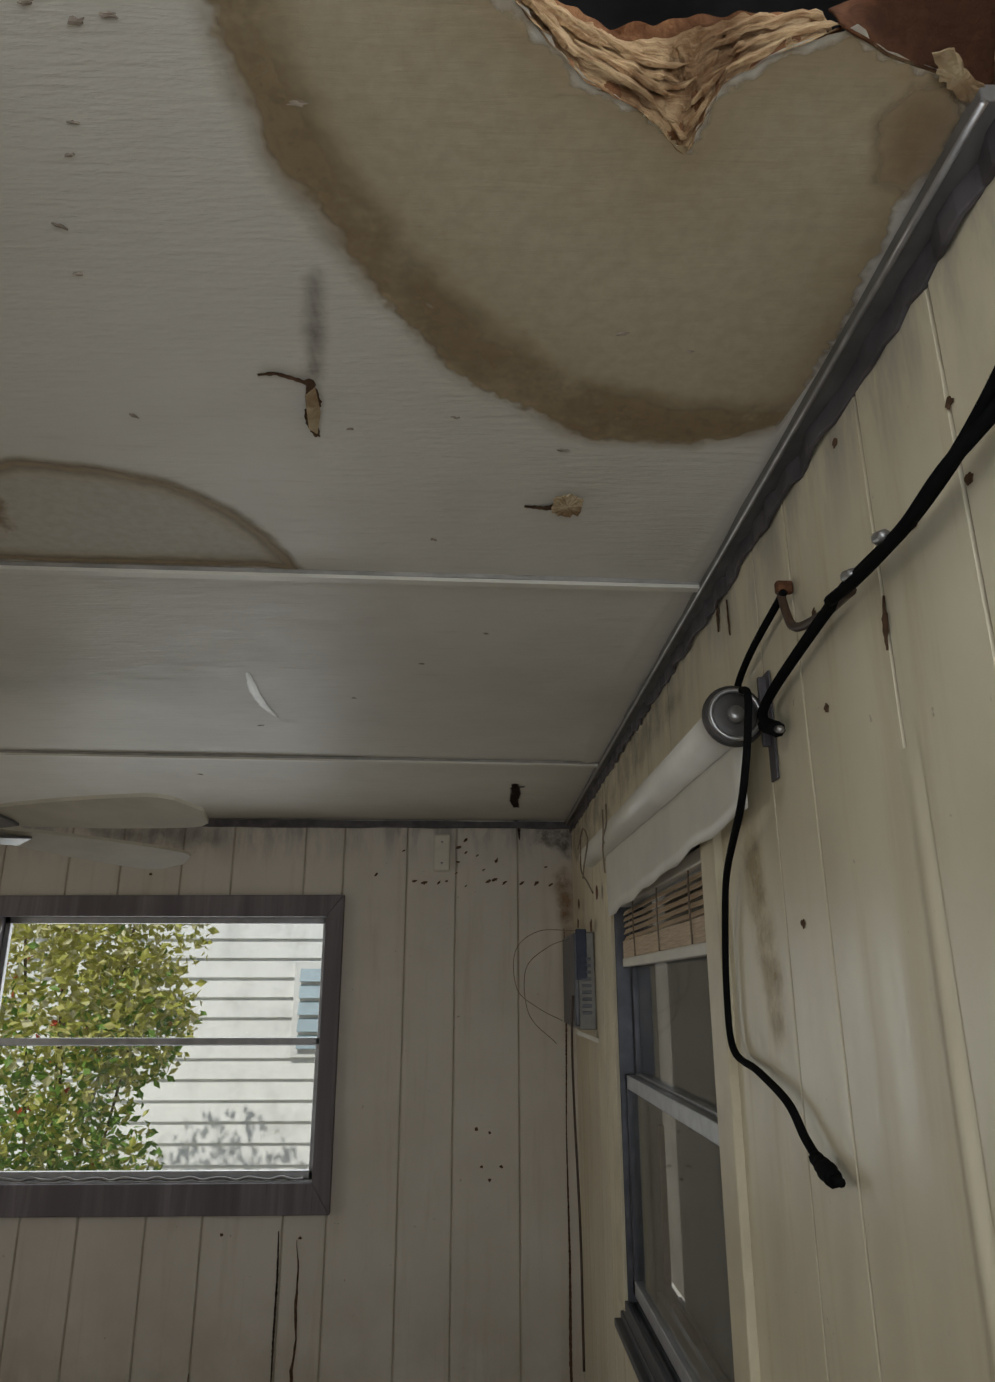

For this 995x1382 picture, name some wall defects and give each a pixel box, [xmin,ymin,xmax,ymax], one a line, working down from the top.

peeling [67,11,118,25]
peeling [932,47,985,103]
leakage [208,0,960,443]
leakage [0,461,296,569]